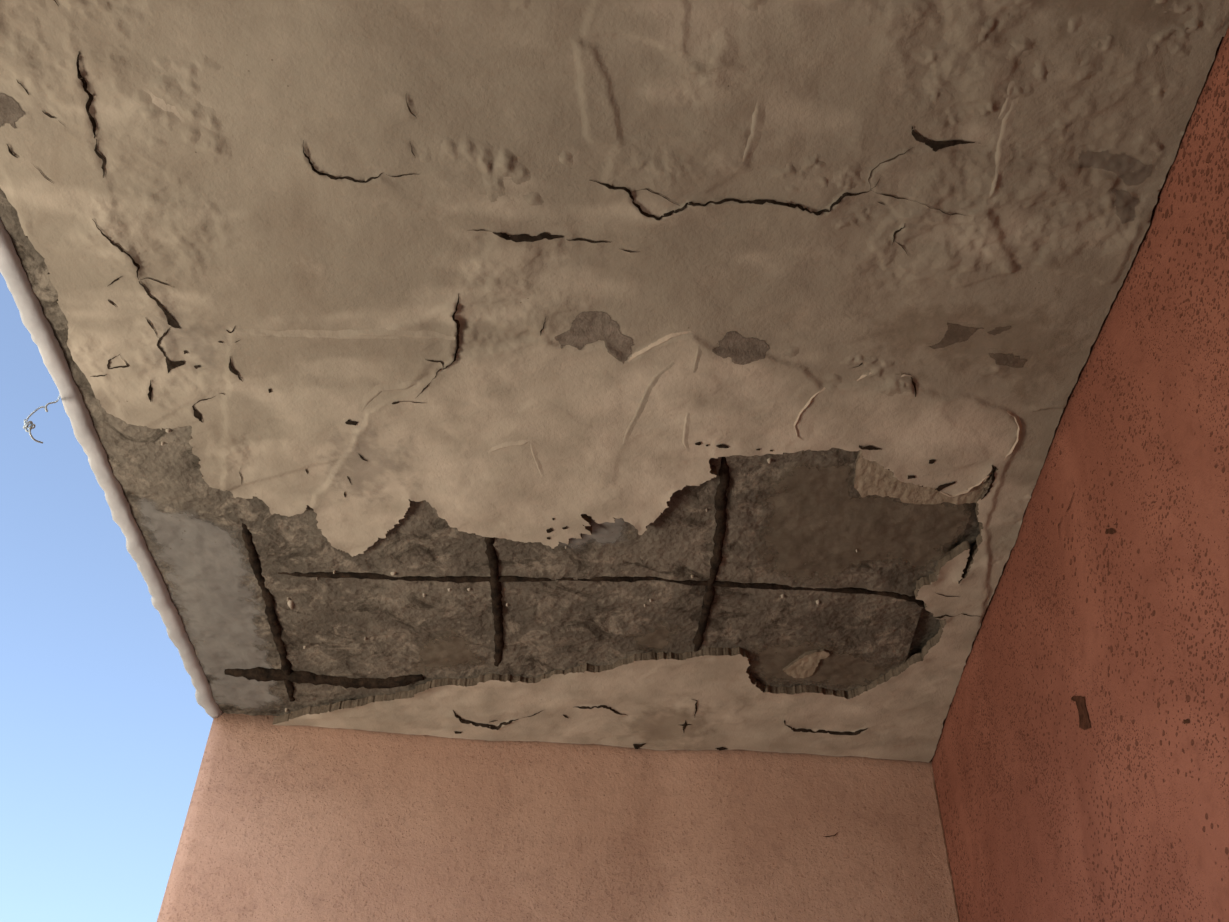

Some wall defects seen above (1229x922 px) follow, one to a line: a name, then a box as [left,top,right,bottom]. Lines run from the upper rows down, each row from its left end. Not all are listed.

peeling [0,93,25,128]
crack [16,51,106,178]
crack [303,93,419,183]
crack [467,230,632,253]
crack [590,149,972,255]
crack [397,294,460,403]
peeling [989,353,1027,368]
spalling [0,188,1021,716]
crack [453,705,626,730]
crack [784,720,868,735]